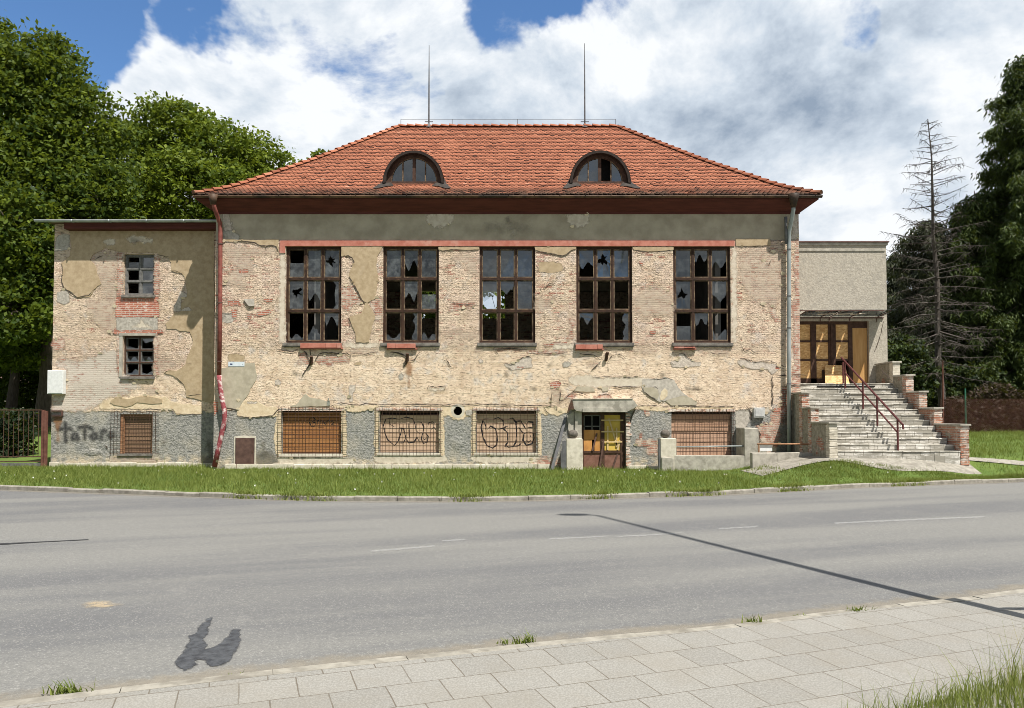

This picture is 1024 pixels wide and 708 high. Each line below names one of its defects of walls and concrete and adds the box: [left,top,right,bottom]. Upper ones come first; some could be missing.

spalling [535,246,576,273]
peeling [51,230,279,419]
flaking render [448,302,477,312]
spalling [476,318,577,371]
crack [275,255,805,441]
flaking render [635,286,674,318]
peeling [635,331,787,452]